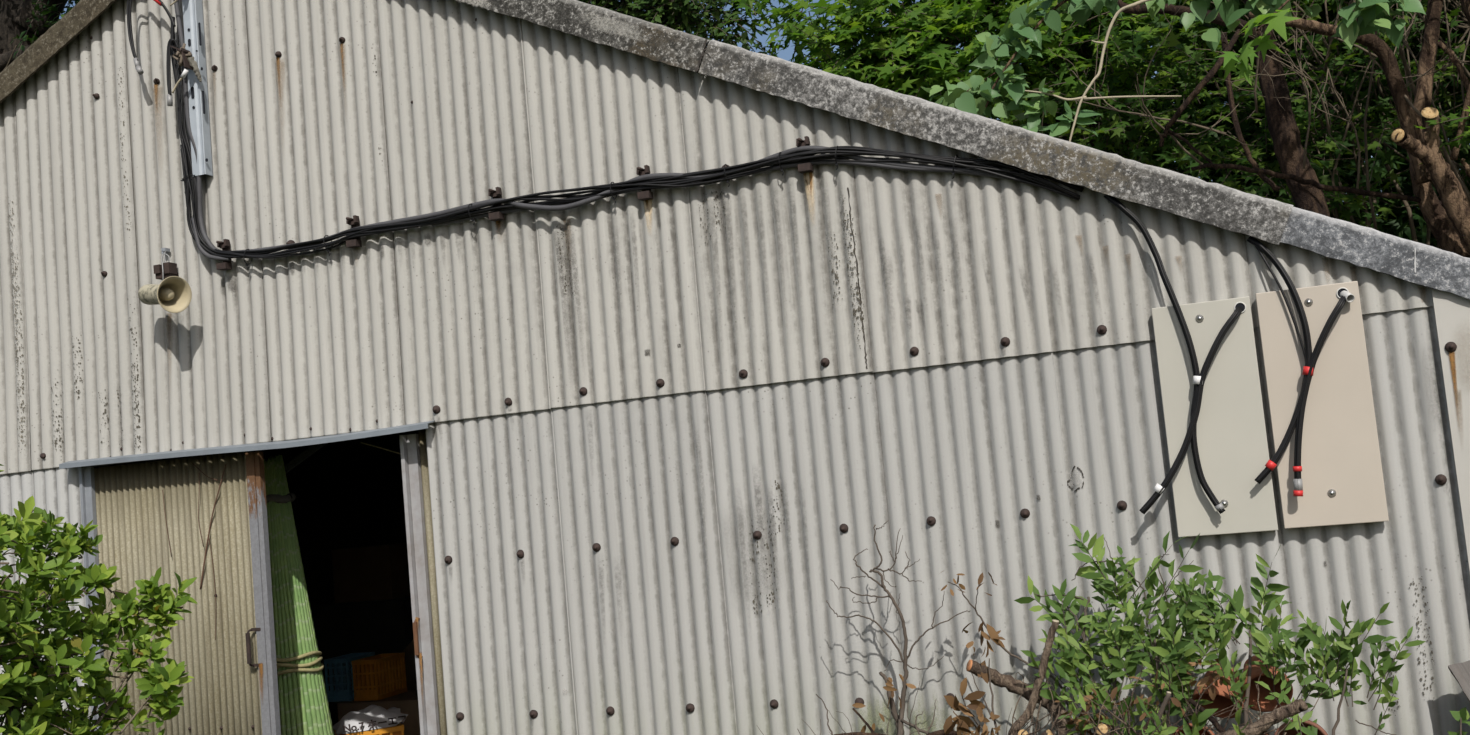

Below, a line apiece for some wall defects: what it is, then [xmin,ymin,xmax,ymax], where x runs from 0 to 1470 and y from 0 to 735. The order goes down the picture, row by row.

rust [803,172,814,207]
rust [1449,352,1457,397]